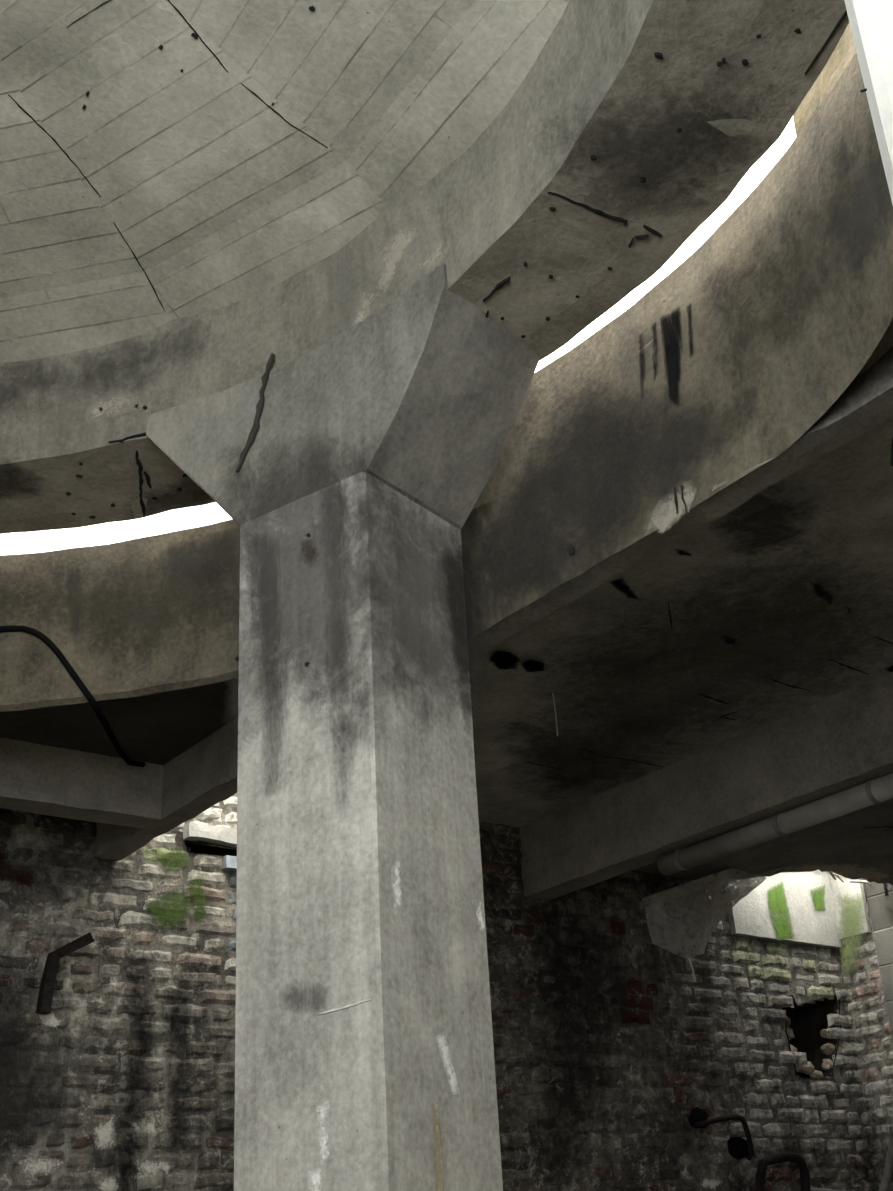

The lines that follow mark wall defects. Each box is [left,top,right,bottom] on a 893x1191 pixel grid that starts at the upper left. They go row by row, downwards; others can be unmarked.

crack [168,0,328,148]
crack [805,10,847,76]
crack [8,94,101,197]
crack [548,192,663,248]
leakage [639,304,693,404]
crack [235,353,275,473]
crack [108,432,152,517]
leakage [721,486,799,554]
leakage [254,543,280,751]
leakage [446,550,472,713]
spalling [783,994,841,1081]
leakage [23,1156,62,1175]